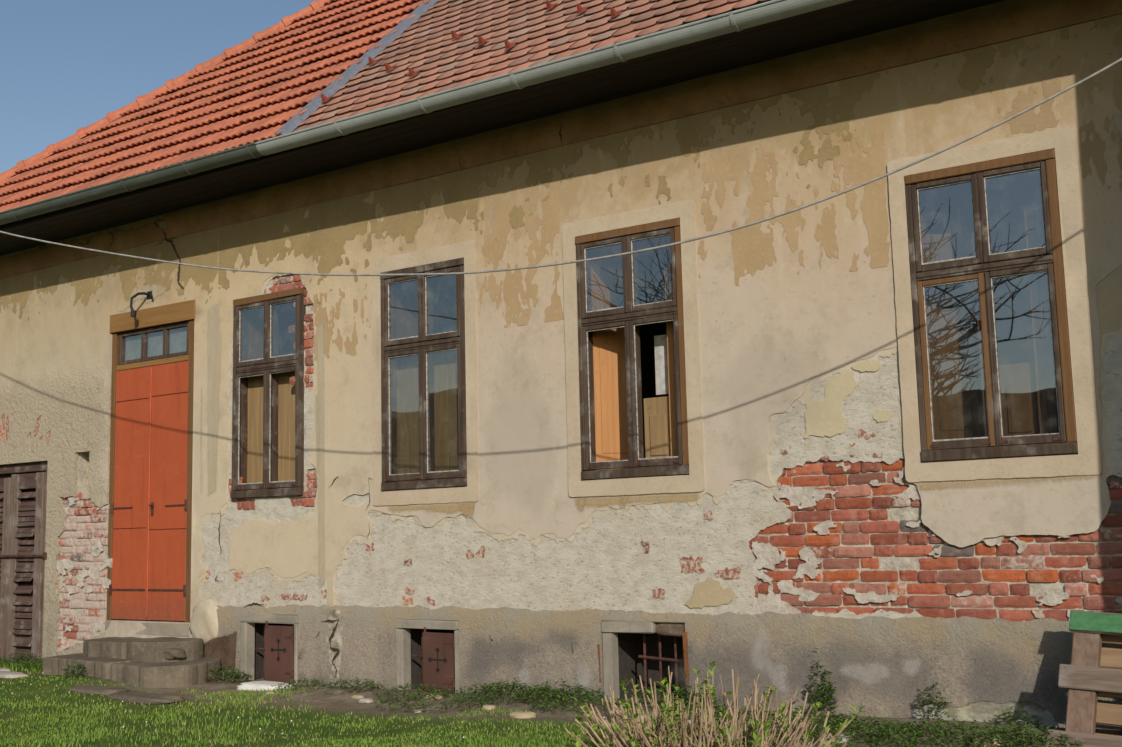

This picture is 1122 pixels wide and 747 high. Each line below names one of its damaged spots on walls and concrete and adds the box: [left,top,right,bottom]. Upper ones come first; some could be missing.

peeling [675,70,890,286]
peeling [993,45,1122,190]
crack [156,231,183,288]
flaking render [0,123,1122,683]
crack [315,619,340,678]